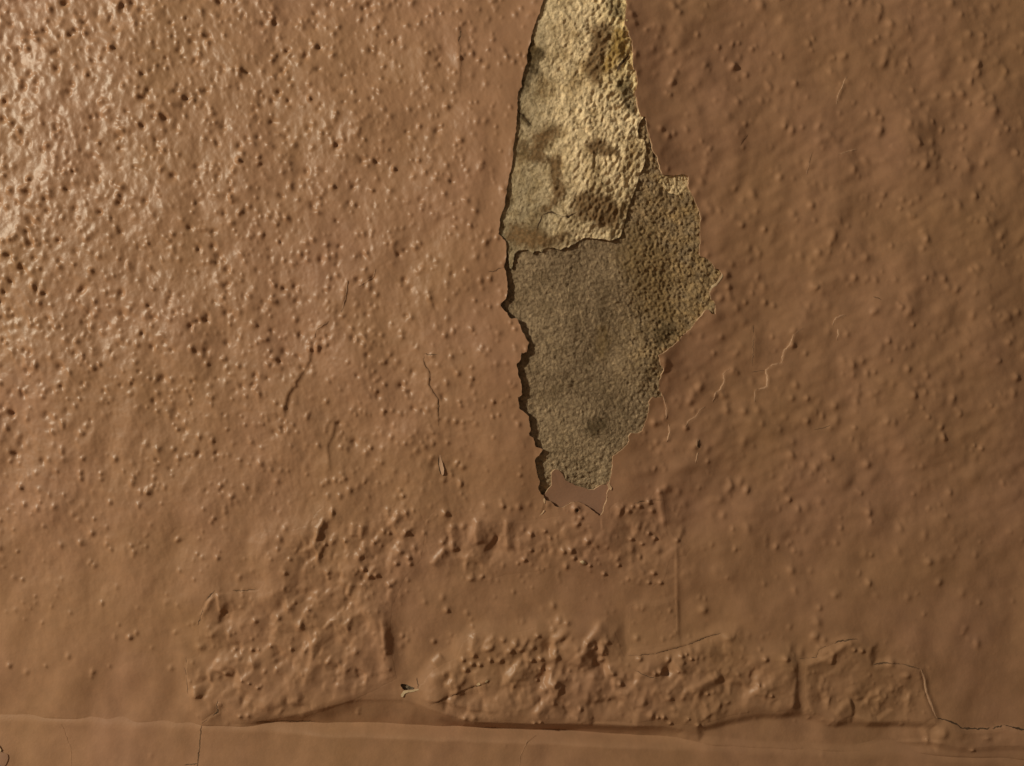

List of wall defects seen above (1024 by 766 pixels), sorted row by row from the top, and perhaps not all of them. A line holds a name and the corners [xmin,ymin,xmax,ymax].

peeling [498,0,723,516]
crack [628,633,720,679]
crack [874,662,1024,731]